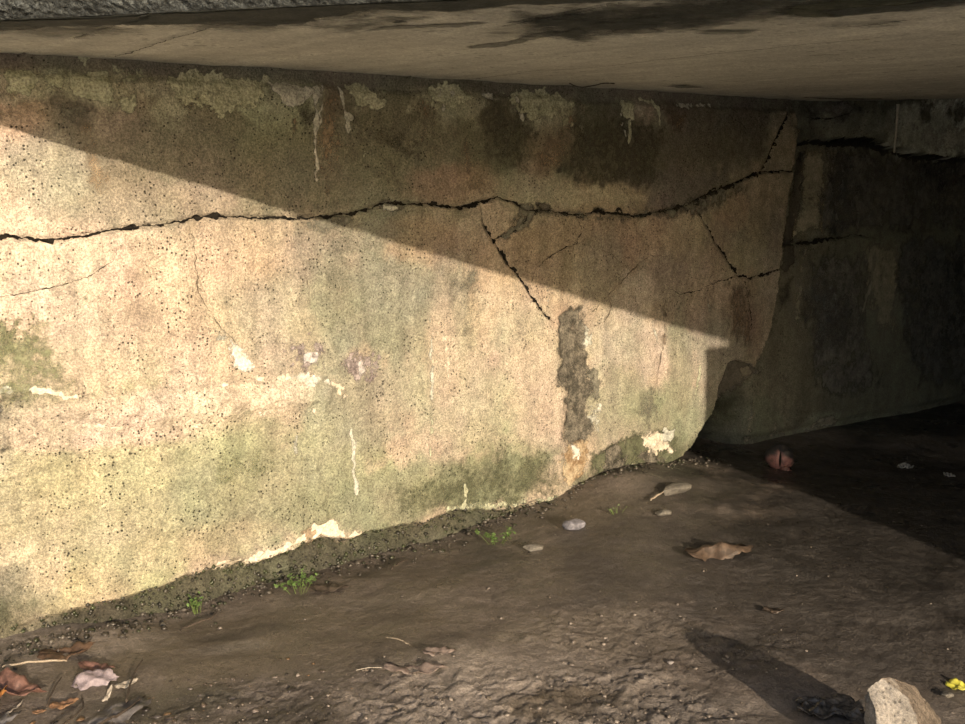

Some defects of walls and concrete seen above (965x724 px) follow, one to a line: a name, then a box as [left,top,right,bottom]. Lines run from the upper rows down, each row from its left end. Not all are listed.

water stain [0,0,965,48]
water stain [3,57,154,125]
water stain [167,68,324,181]
water stain [337,82,387,134]
water stain [427,80,662,189]
crack [0,110,857,389]
water stain [29,386,79,400]
water stain [272,372,346,398]
spalling [717,360,760,398]
water stain [349,429,359,495]
water stain [447,484,557,511]
water stain [212,519,362,569]